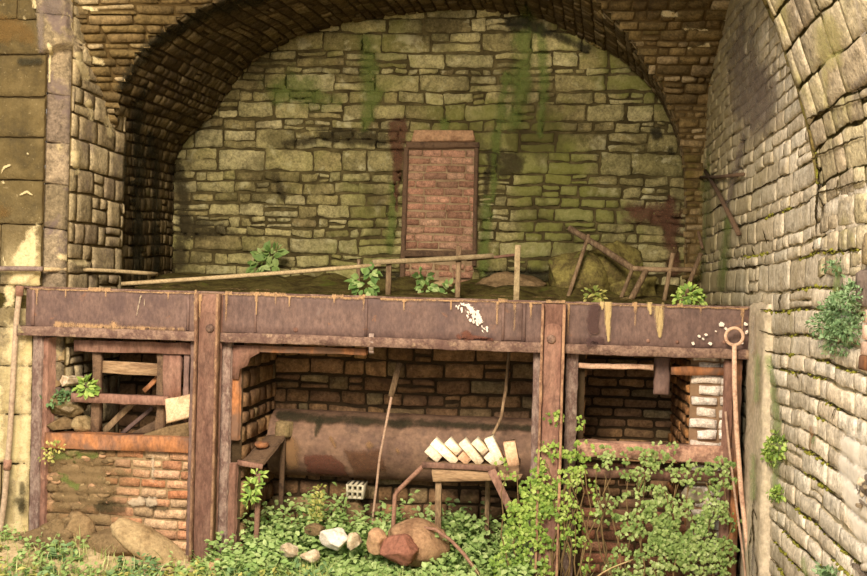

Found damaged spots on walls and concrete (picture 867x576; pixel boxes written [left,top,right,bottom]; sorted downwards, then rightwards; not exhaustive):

crack [703,136,867,271]
rust [29,287,113,300]
rust [54,322,179,330]
rust [127,286,365,317]
peeling [456,303,488,333]
rust [456,330,493,341]
rust [380,294,576,326]
rust [666,303,748,330]
crack [748,498,861,576]